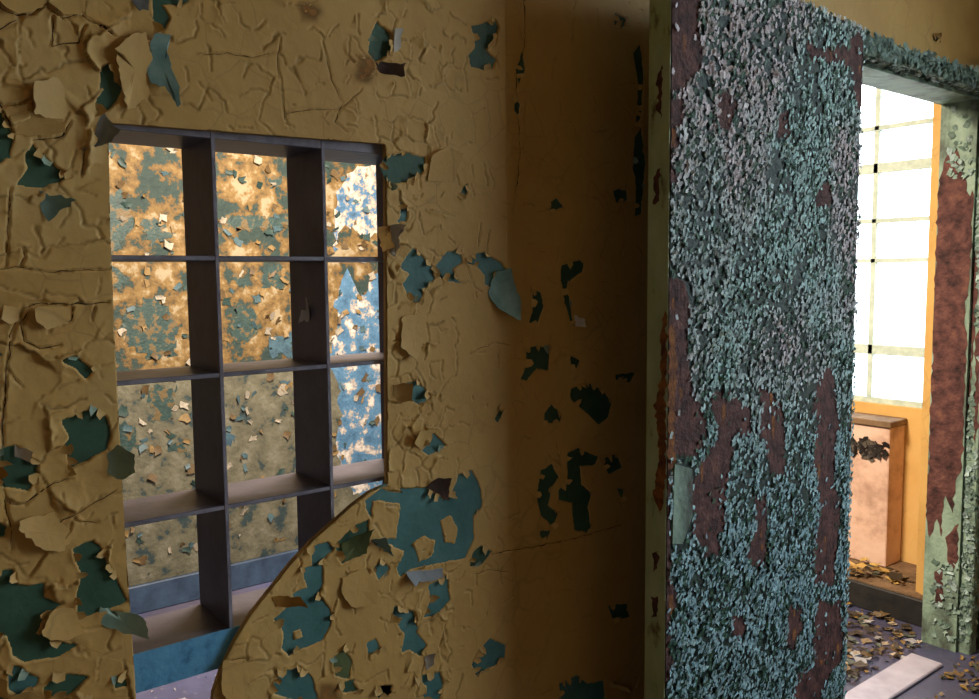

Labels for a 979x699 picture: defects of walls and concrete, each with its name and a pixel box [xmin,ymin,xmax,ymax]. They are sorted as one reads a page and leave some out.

crack [0,6,115,47]
crack [198,38,363,127]
corrosion [653,0,704,205]
crack [6,187,101,273]
crack [2,302,107,548]
peeling [0,512,150,699]
peeling [267,469,491,699]
peeling [325,146,543,465]
corrosion [651,278,785,691]
corrosion [794,363,844,699]
peeling [666,0,979,699]
corrosion [926,147,979,605]